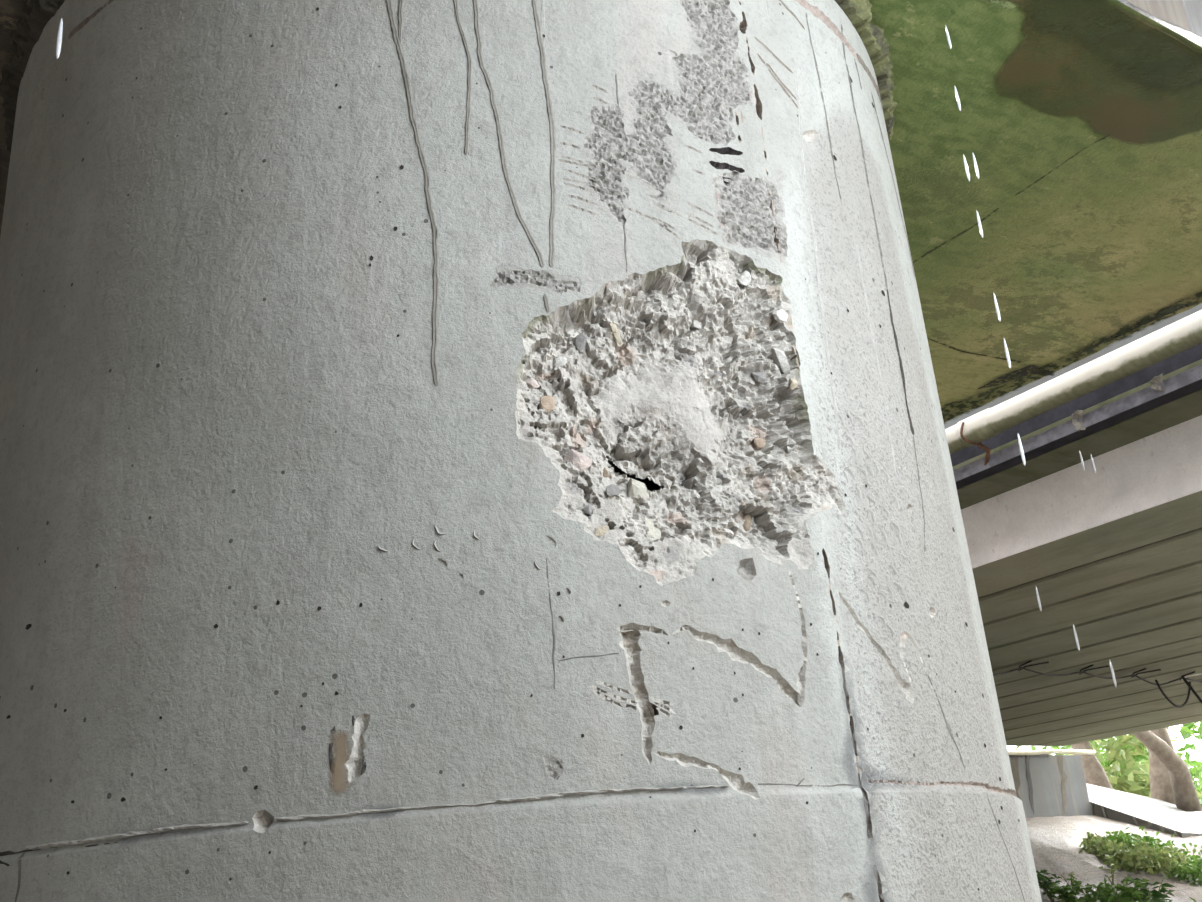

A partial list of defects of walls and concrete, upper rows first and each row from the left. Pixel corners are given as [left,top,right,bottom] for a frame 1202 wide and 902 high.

crack [68,0,113,39]
crack [613,73,621,107]
spalling [709,147,745,183]
crack [735,0,781,262]
crack [794,0,885,119]
crack [913,135,1109,263]
damp [995,0,1202,144]
crack [927,337,1021,363]
spalling [515,239,845,607]
peeling [345,713,370,783]
crack [758,548,1025,902]
damp [1009,754,1049,813]